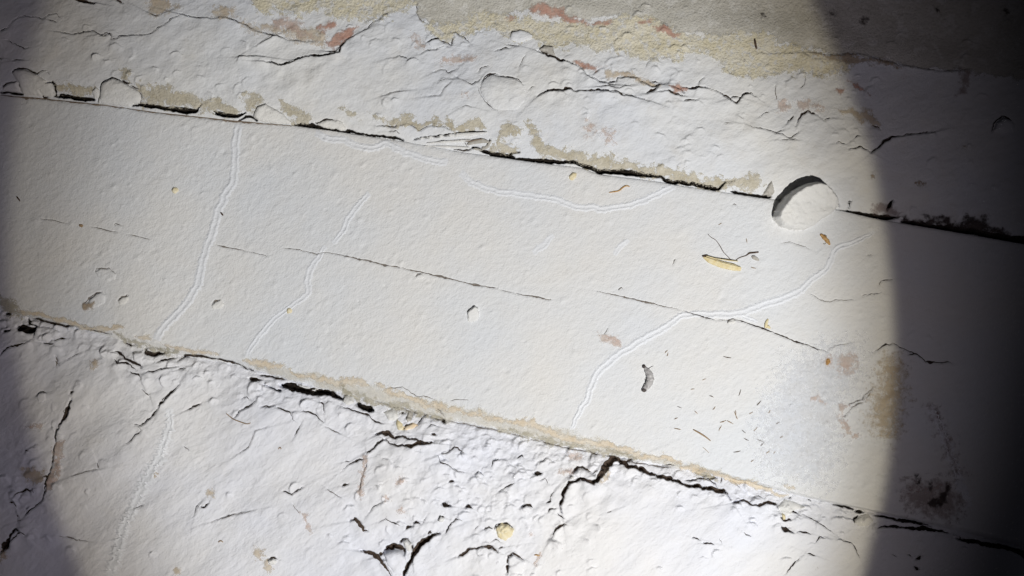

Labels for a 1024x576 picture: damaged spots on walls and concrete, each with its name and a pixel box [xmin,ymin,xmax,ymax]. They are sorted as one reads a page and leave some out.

flaking render [242,0,1024,80]
peeling [56,83,96,97]
peeling [119,68,264,119]
peeling [278,99,312,127]
peeling [369,113,486,133]
crack [314,119,676,214]
peeling [489,119,767,194]
crack [3,337,77,357]
crack [60,123,243,576]
crack [878,343,951,364]
crack [235,231,893,576]
crack [1,391,99,552]